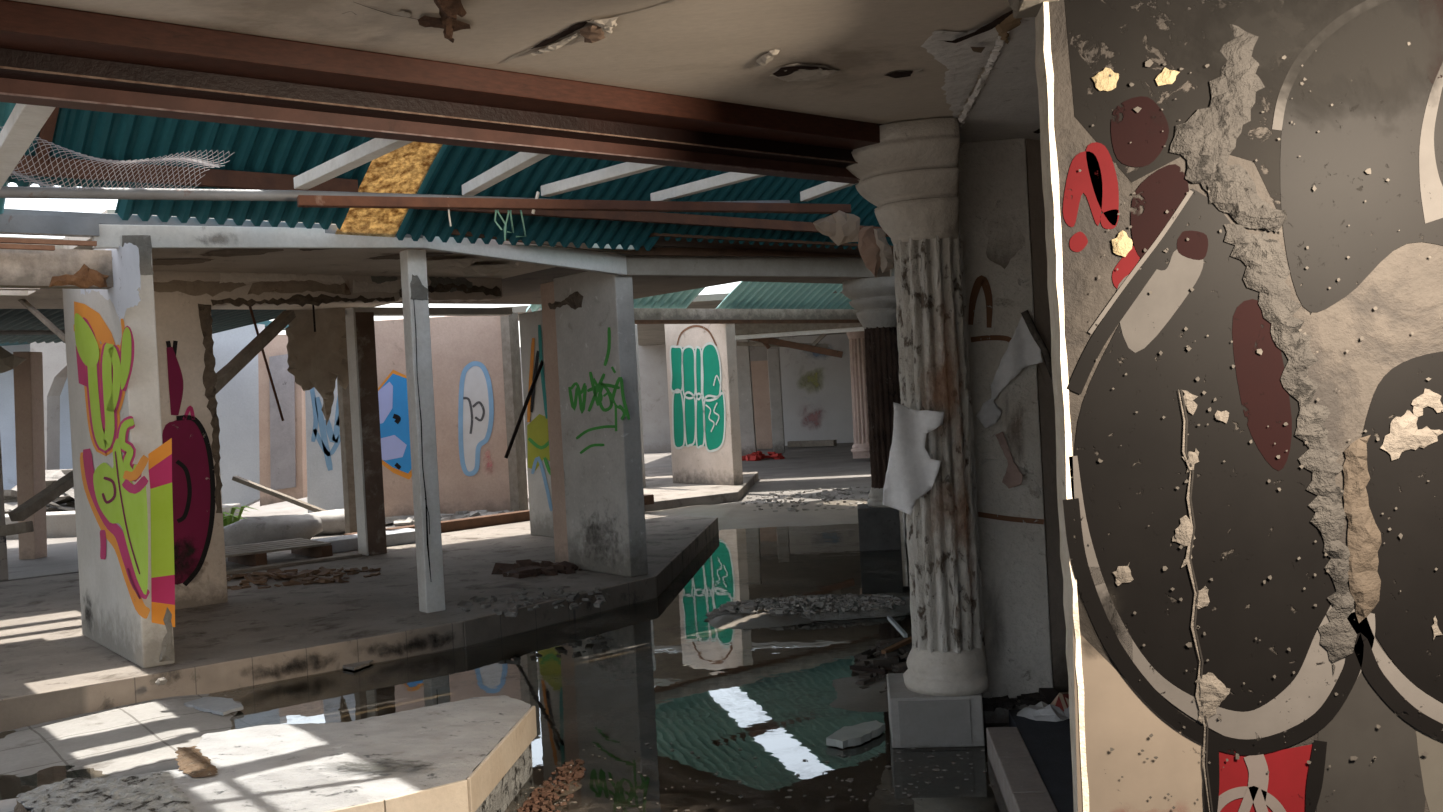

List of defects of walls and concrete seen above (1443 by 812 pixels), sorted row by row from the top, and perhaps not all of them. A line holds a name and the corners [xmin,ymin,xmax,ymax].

peeling [1348,377,1443,460]